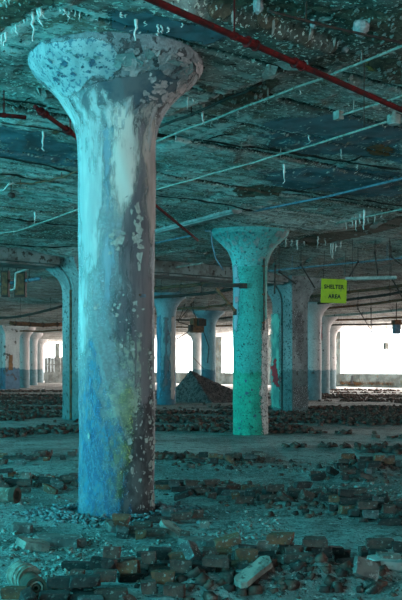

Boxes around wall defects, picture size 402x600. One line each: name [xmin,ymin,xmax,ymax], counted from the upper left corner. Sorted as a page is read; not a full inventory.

damp [0,3,227,45]
peeling [0,37,300,122]
crack [157,133,401,170]
peeling [108,202,144,271]